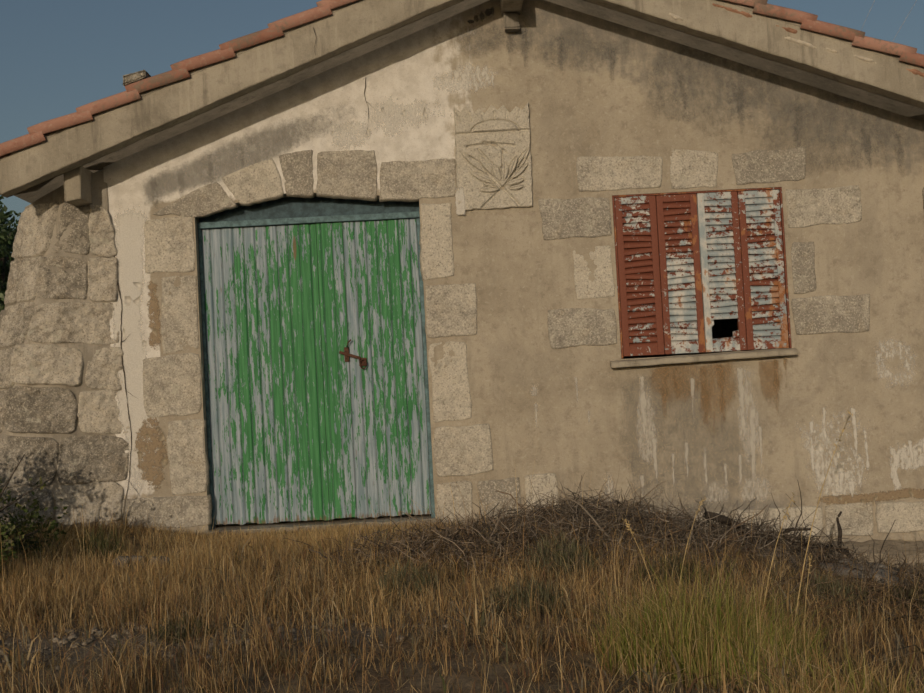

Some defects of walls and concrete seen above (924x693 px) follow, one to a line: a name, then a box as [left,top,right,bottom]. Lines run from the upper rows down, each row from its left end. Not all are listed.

peeling [112,209,168,489]
leakage [637,376,658,478]
leakage [737,367,768,501]